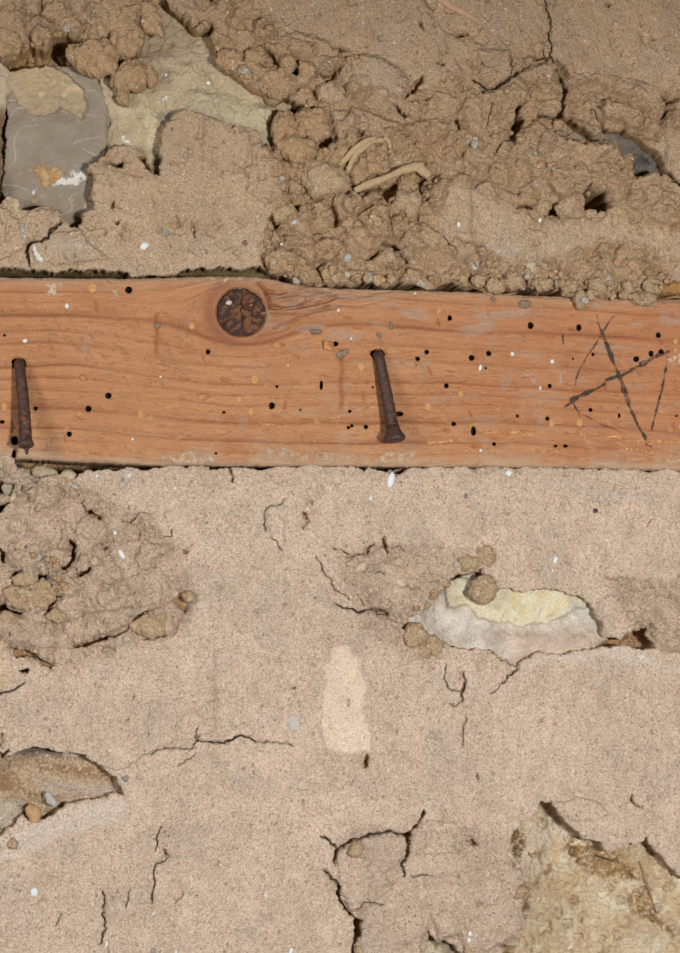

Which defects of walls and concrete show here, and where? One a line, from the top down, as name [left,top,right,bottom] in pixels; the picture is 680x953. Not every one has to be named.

crack [473,0,555,153]
spalling [0,0,680,311]
crack [151,728,294,766]
crack [364,830,401,838]